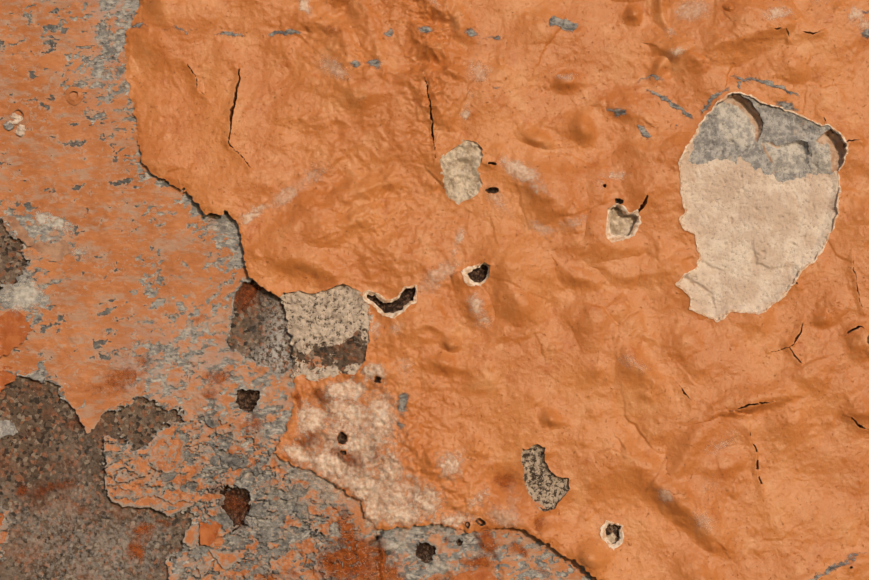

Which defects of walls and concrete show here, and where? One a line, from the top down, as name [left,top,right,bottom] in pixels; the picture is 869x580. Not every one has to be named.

crack [228,70,248,164]
crack [426,86,436,158]
spalling [0,215,71,290]
peeling [440,139,483,205]
peeling [675,92,849,322]
peeling [226,280,373,382]
spalling [0,309,361,580]
peeling [521,444,570,512]